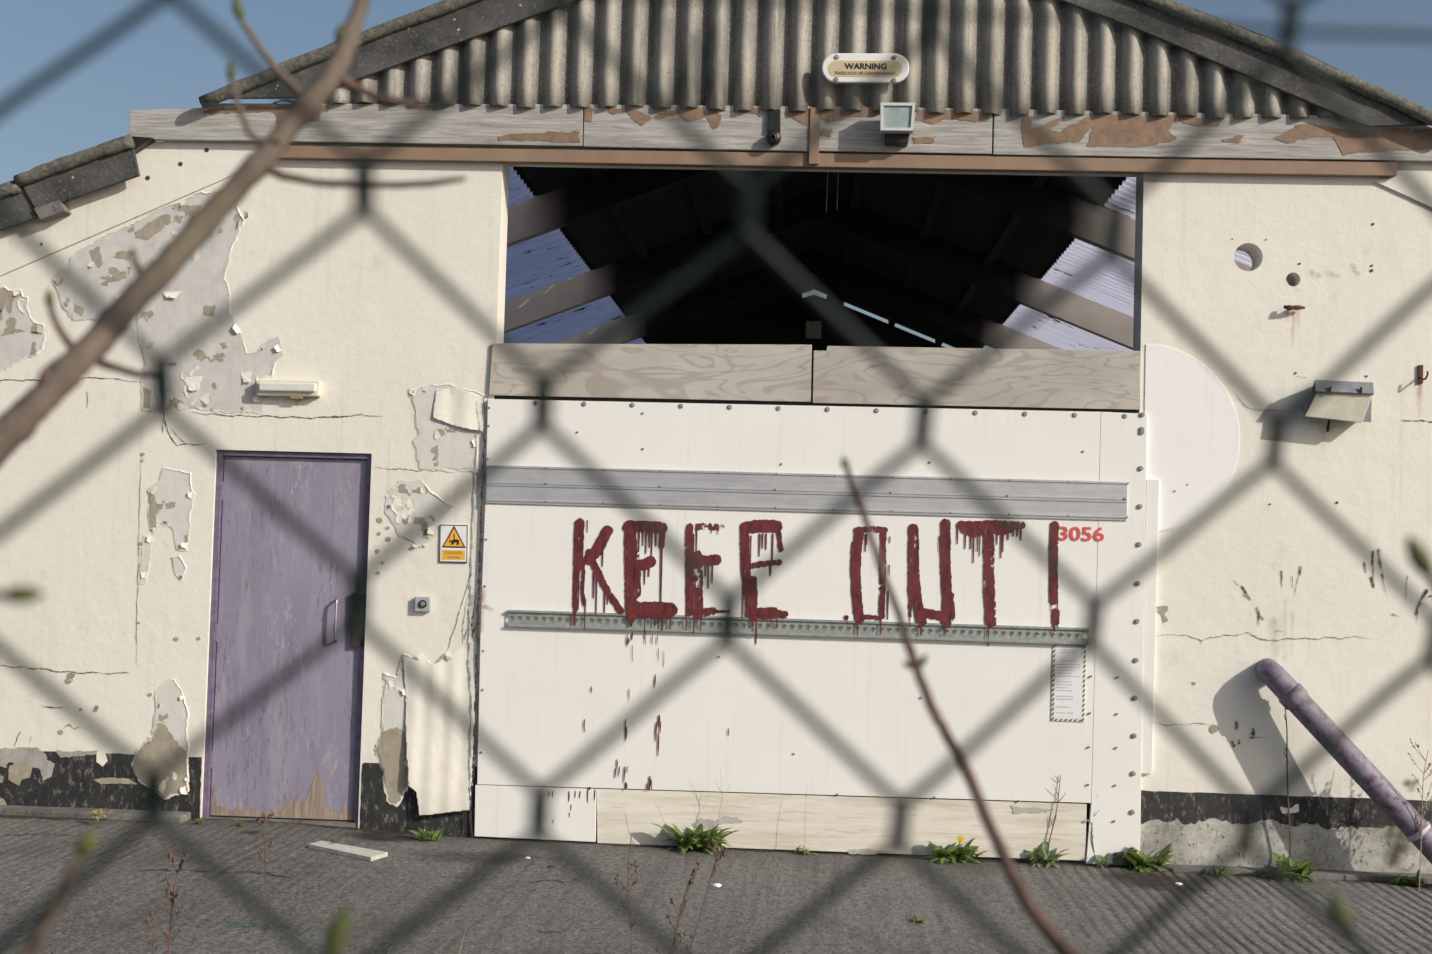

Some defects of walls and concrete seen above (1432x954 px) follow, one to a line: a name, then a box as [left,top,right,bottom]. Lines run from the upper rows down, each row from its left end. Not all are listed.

peeling [1022,115,1244,147]
peeling [1274,123,1432,155]
peeling [0,286,47,371]
peeling [52,190,216,321]
peeling [136,205,284,414]
peeling [137,467,196,584]
peeling [375,382,487,553]
peeling [0,677,190,805]
peeling [375,653,411,807]